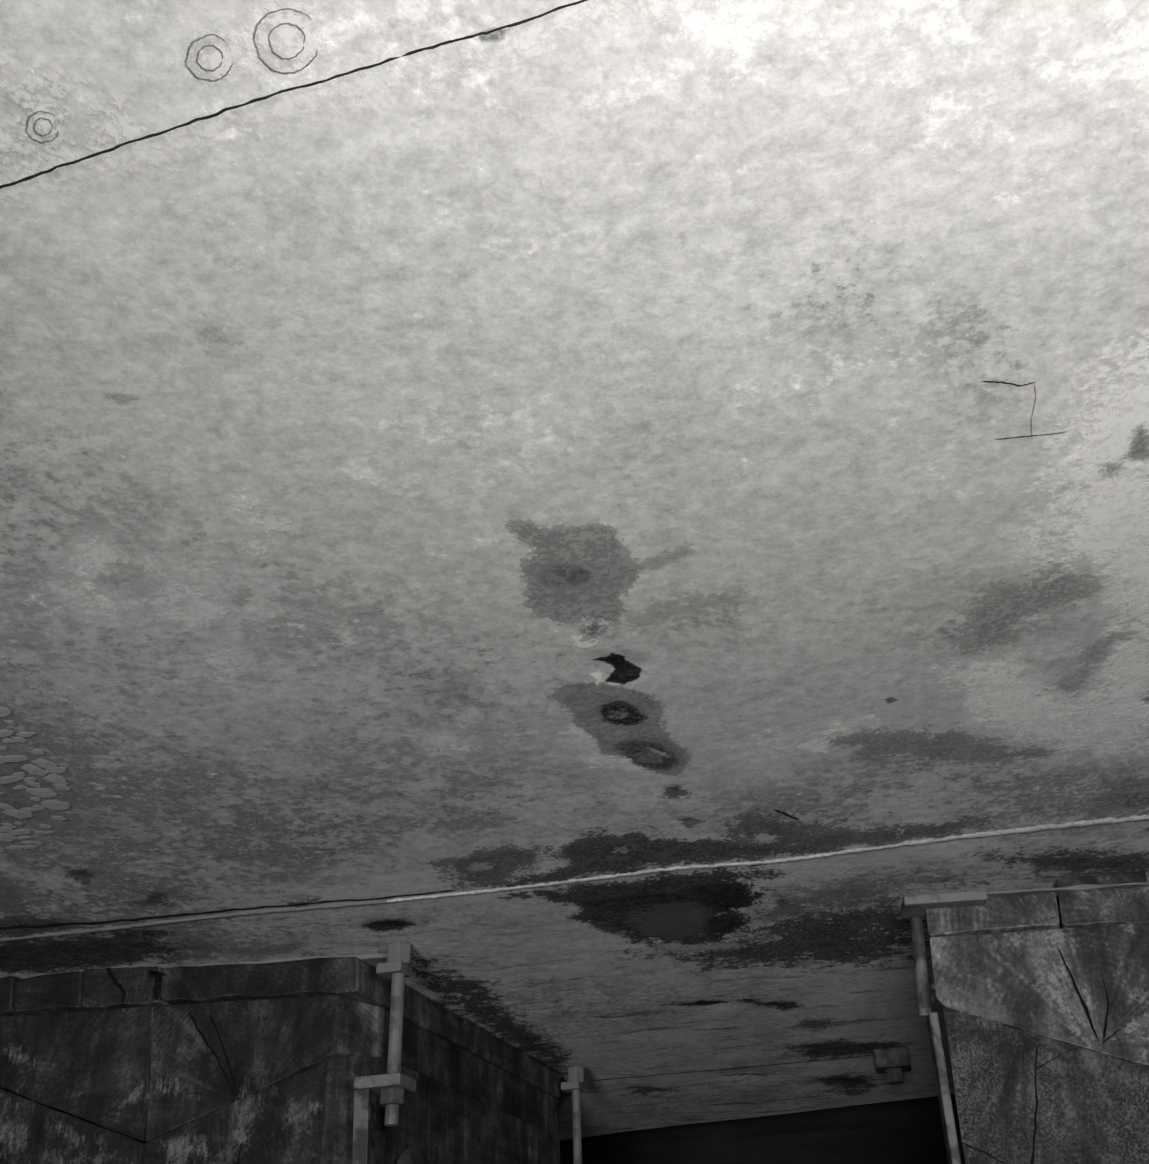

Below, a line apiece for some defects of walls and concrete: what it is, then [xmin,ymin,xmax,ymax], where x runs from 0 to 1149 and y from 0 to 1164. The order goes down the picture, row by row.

crack [638,0,684,16]
crack [0,0,601,206]
damp [505,519,644,643]
damp [708,327,1149,770]
spalling [568,633,642,686]
damp [548,682,691,775]
spalling [597,700,649,726]
spalling [614,739,678,771]
spalling [645,786,691,799]
spalling [679,817,705,828]
damp [426,806,997,889]
damp [619,862,944,973]